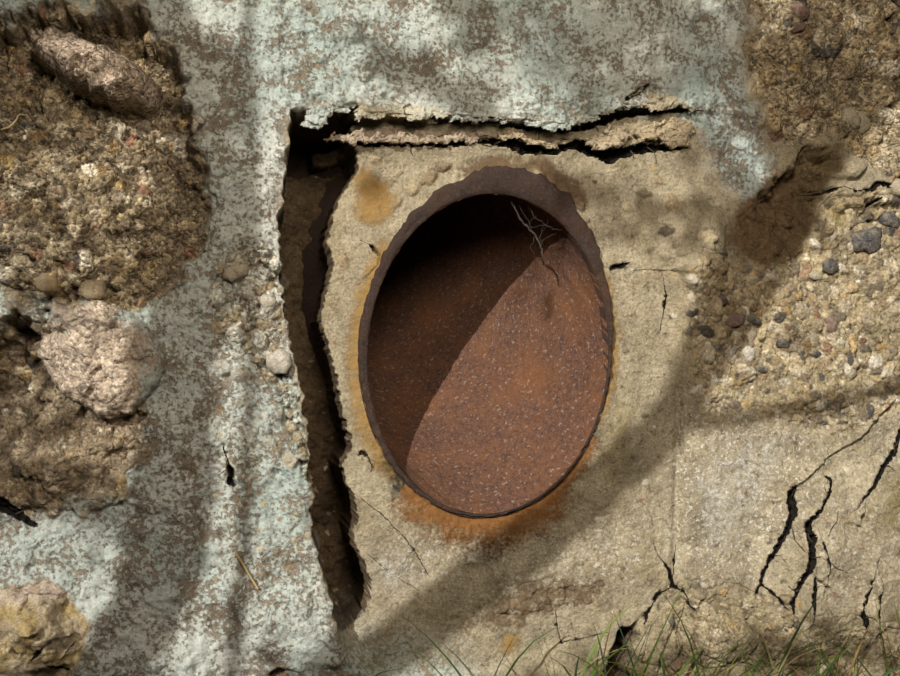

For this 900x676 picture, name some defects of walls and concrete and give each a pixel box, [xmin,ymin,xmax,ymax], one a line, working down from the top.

peeling [300,86,698,151]
crack [357,82,703,164]
rust [354,169,391,225]
rust [458,156,587,209]
spalling [0,0,312,520]
rust [345,245,393,474]
rust [393,437,600,554]
crack [755,446,847,620]
crack [859,430,900,521]
spalling [491,581,604,628]
crack [644,546,696,625]
crack [861,561,884,631]